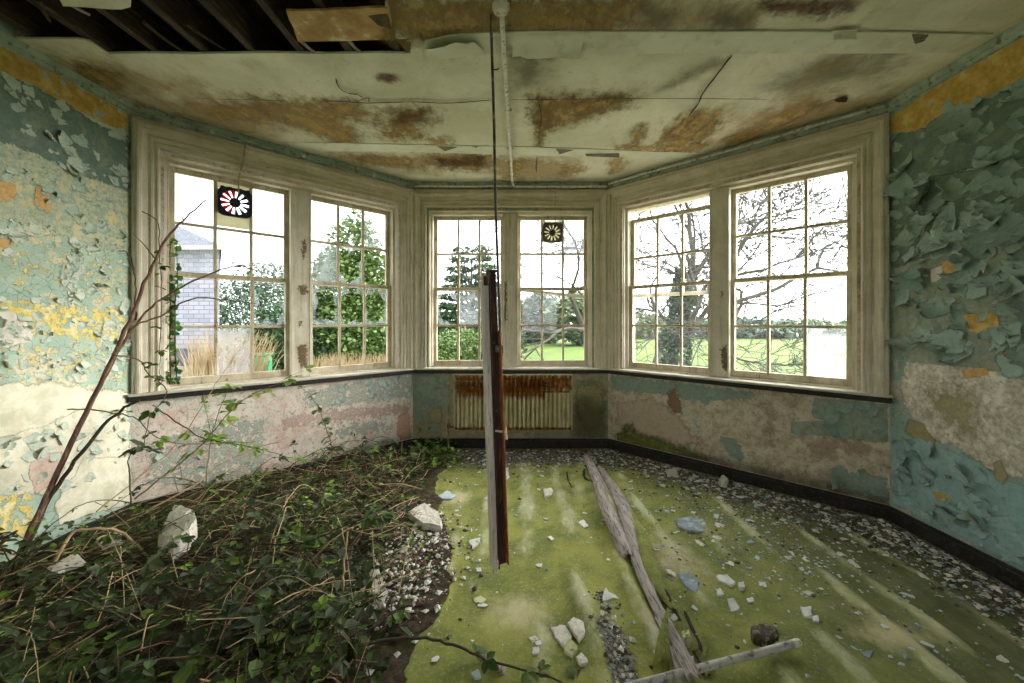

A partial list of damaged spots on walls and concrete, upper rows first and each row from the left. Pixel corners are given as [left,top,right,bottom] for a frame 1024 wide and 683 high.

leakage [75,61,581,180]
crack [523,99,558,173]
leakage [527,93,632,147]
crack [597,55,732,115]
leakage [609,58,883,174]
peeling [0,46,132,545]
peeling [791,37,1024,567]
corrosion [455,375,484,398]
corrosion [503,375,572,399]